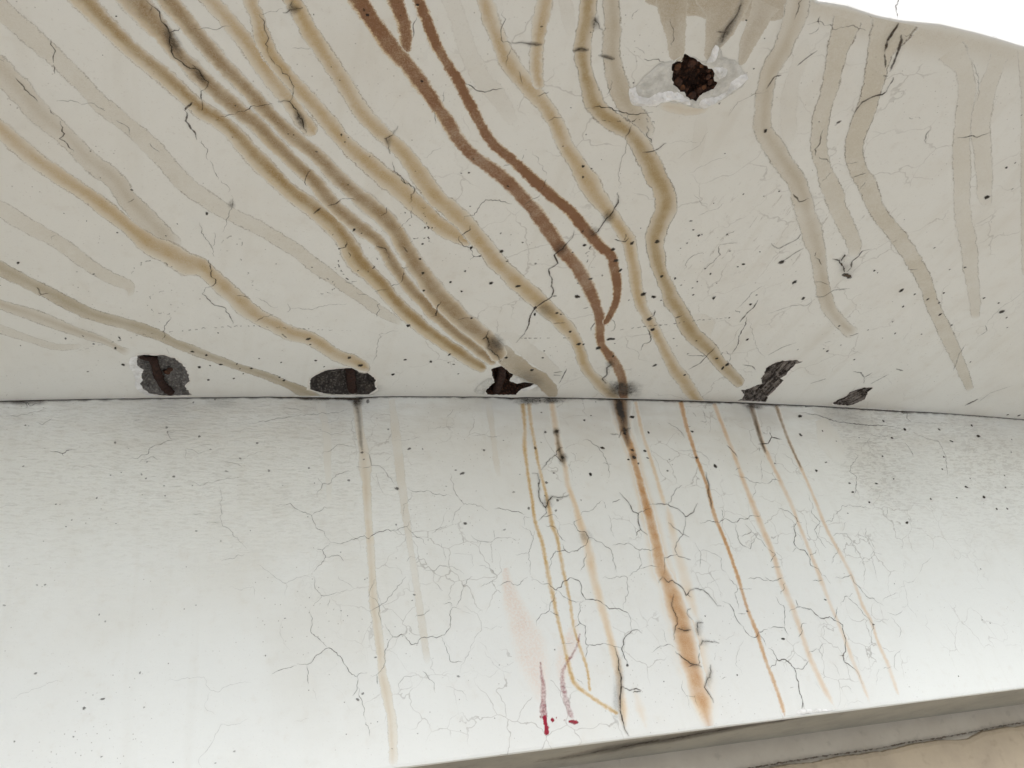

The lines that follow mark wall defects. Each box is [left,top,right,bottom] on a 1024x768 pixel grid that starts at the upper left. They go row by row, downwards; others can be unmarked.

damp [441,0,745,400]
damp [645,0,1024,391]
crack [814,0,903,160]
spalling [129,353,192,397]
damp [0,0,649,766]
spalling [307,367,378,396]
rust [347,0,720,727]
crack [497,365,1024,426]
spalling [738,359,803,403]
crack [500,450,853,731]
rust [678,401,786,717]
rust [711,402,870,707]